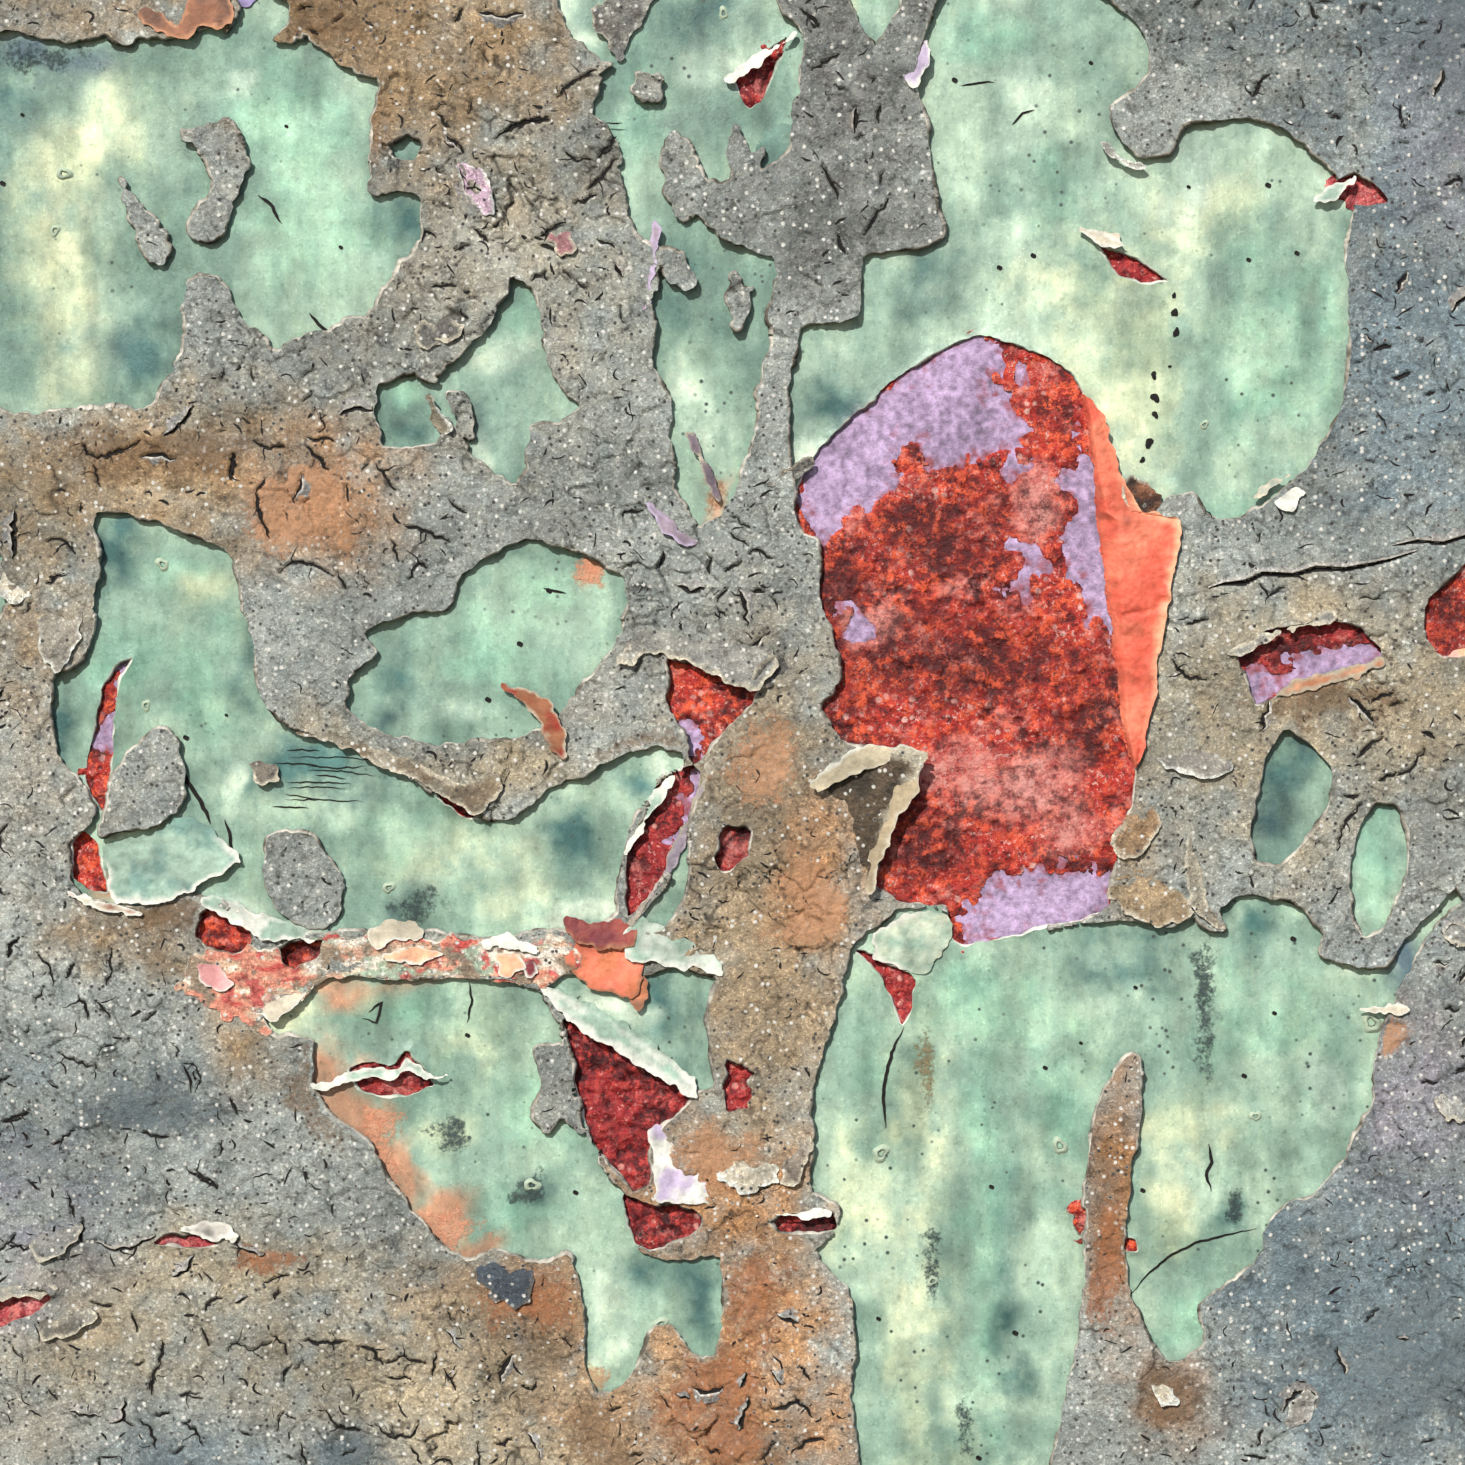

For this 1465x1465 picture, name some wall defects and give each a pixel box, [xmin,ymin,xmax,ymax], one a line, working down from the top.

peeling [0,0,421,415]
crack [0,313,467,613]
rust [616,329,1182,953]
peeling [788,0,1353,519]
crack [1165,174,1465,851]
crack [0,775,574,1465]
peeling [29,513,723,1391]
rust [653,1253,798,1465]
crack [609,1262,845,1465]
rust [756,1208,837,1232]
peeling [717,804,1465,1465]
rust [1066,1199,1137,1323]